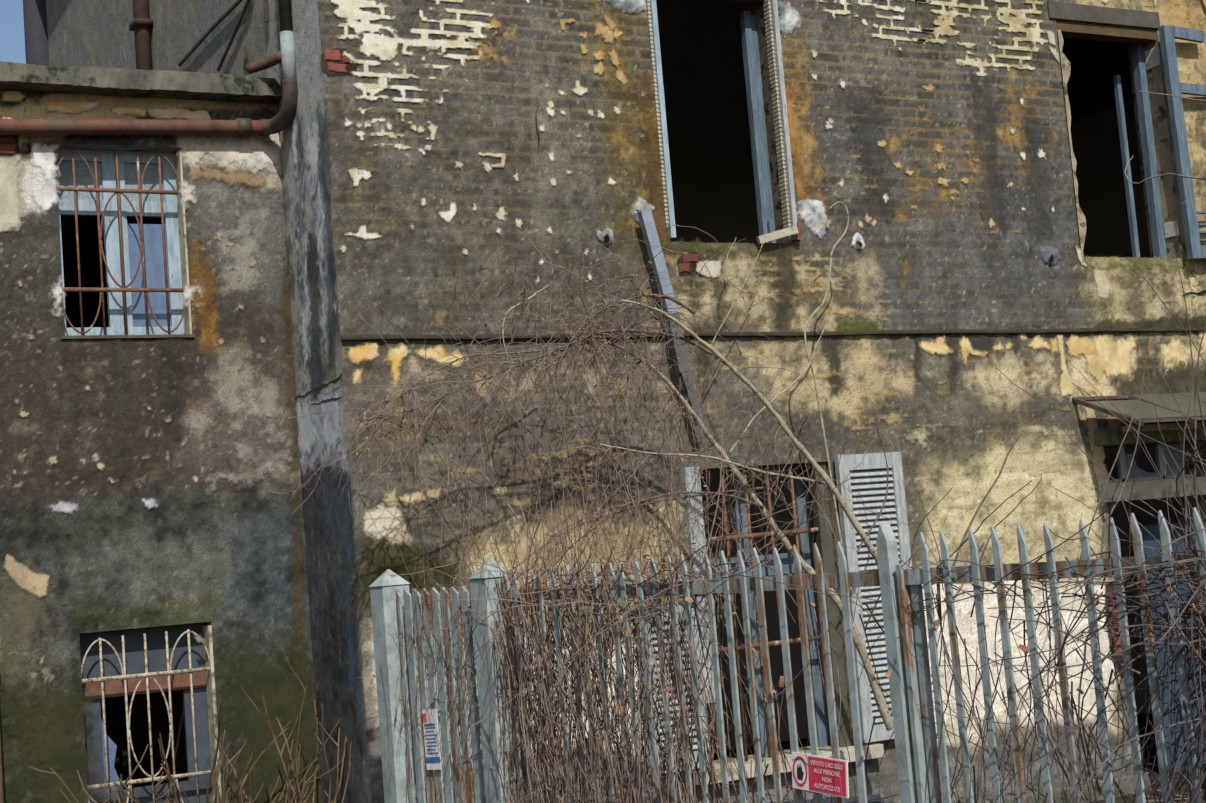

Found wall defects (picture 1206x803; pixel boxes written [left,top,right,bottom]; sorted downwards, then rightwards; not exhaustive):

peeling [320,0,497,155]
flaking render [0,135,58,232]
corrosion [192,240,218,356]
peeling [180,120,380,379]
water stain [285,105,337,394]
water stain [698,249,724,379]
water stain [775,248,795,332]
water stain [821,336,842,395]
peeling [816,0,1128,300]
water stain [914,263,1206,396]
flaking render [1022,335,1136,507]
flaking render [363,487,441,545]